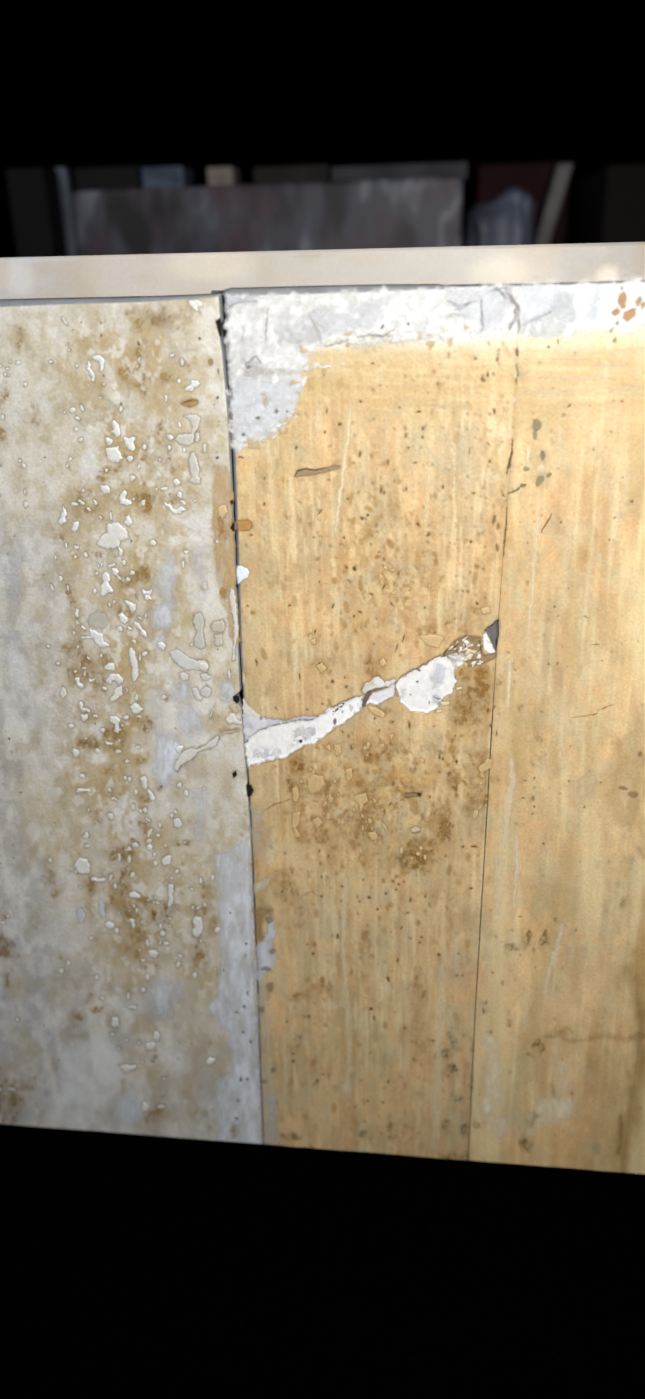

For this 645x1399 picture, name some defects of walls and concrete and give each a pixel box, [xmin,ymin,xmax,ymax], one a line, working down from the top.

water stain [153,563,174,627]
water stain [153,683,196,784]
peeling [43,279,645,1073]
water stain [209,841,261,1144]